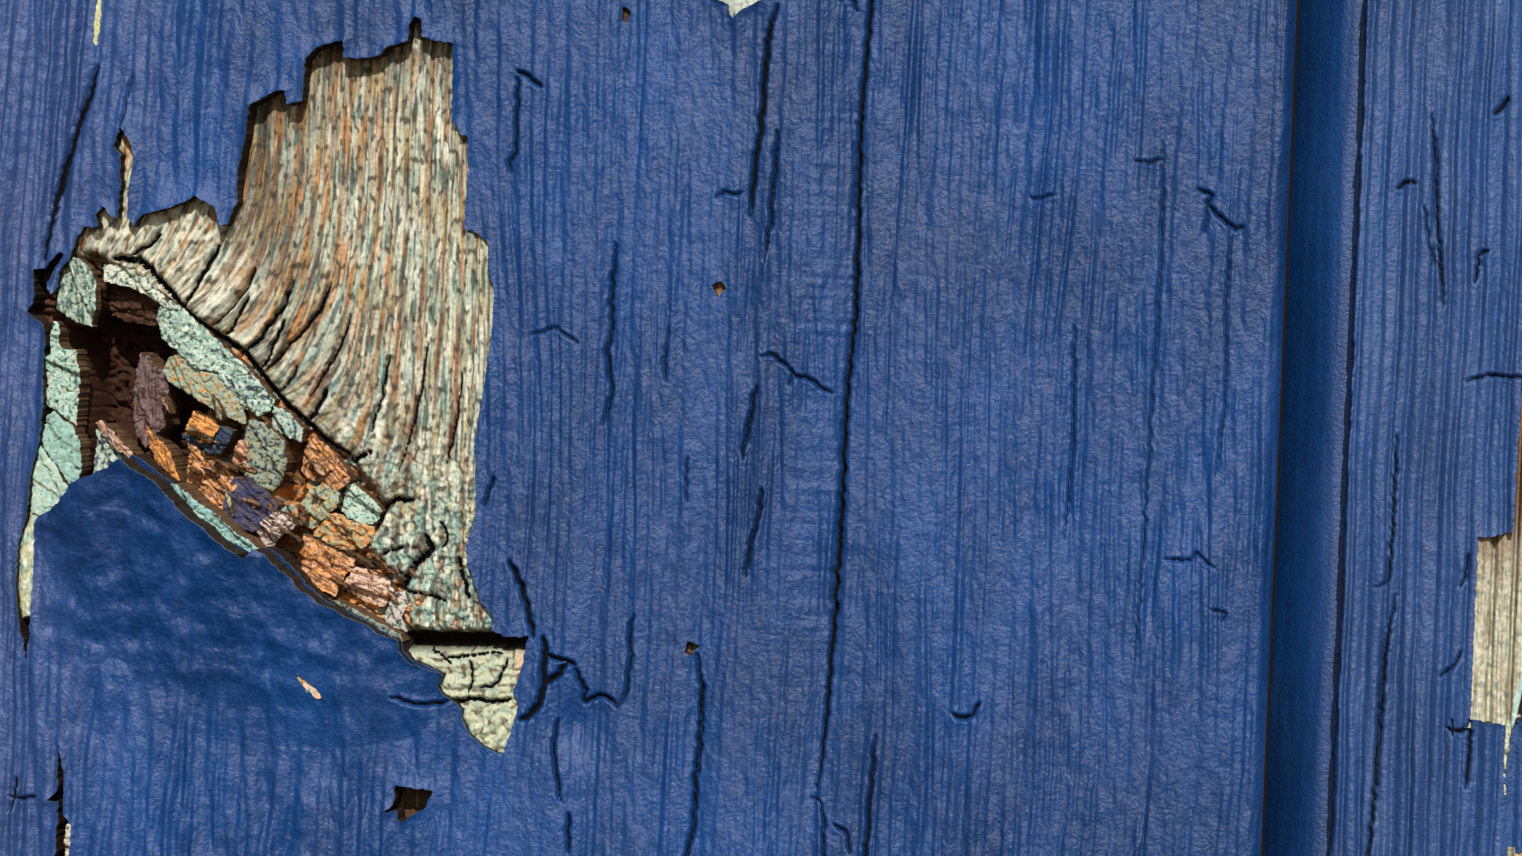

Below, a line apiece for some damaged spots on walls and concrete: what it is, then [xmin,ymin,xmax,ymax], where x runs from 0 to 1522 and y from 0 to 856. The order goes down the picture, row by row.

peeling [719,0,760,17]
peeling [18,19,529,753]
peeling [393,786,432,818]
crack [389,697,451,705]
crack [509,560,635,853]
peeling [1464,381,1522,803]